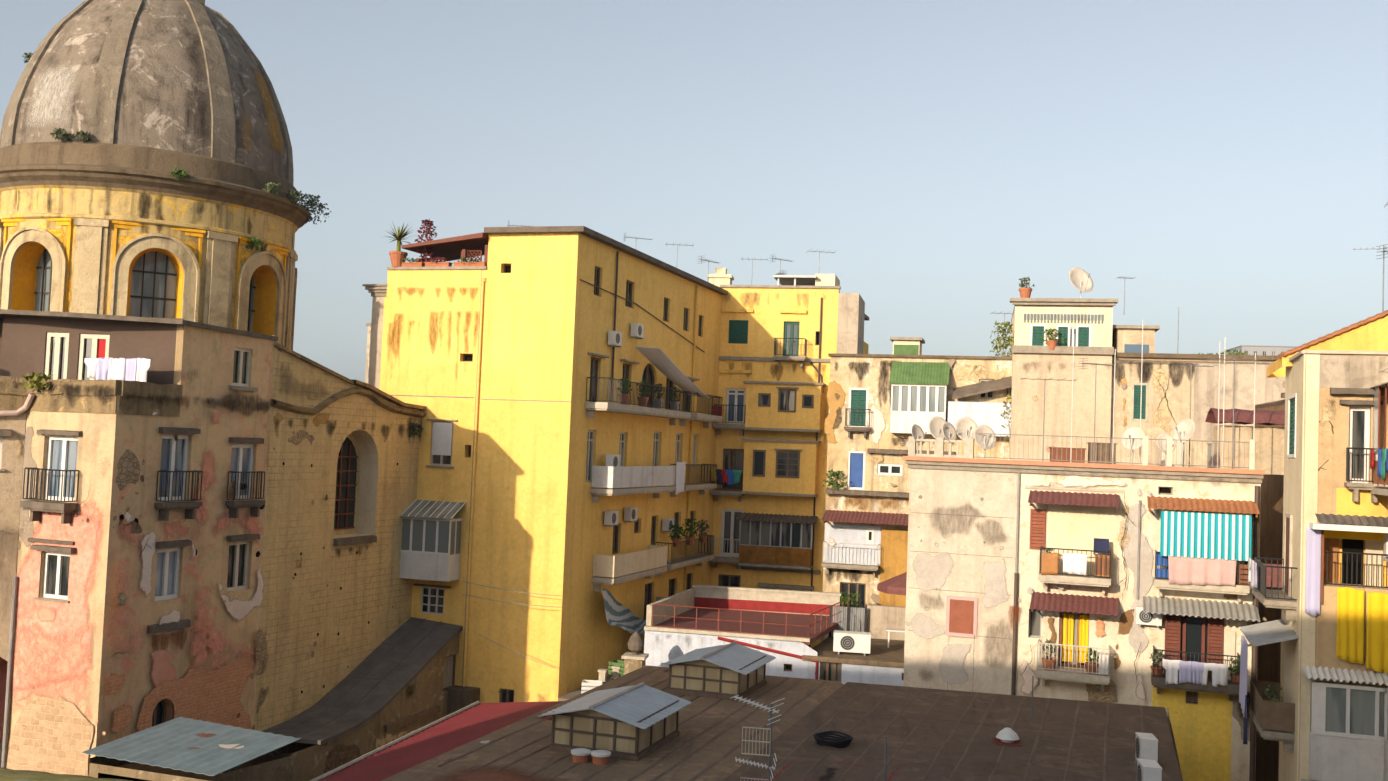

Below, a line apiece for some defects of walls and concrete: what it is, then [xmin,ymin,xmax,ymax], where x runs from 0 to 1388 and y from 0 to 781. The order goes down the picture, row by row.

water stain [430,313,478,346]
water stain [43,385,129,401]
peeling [219,568,264,620]